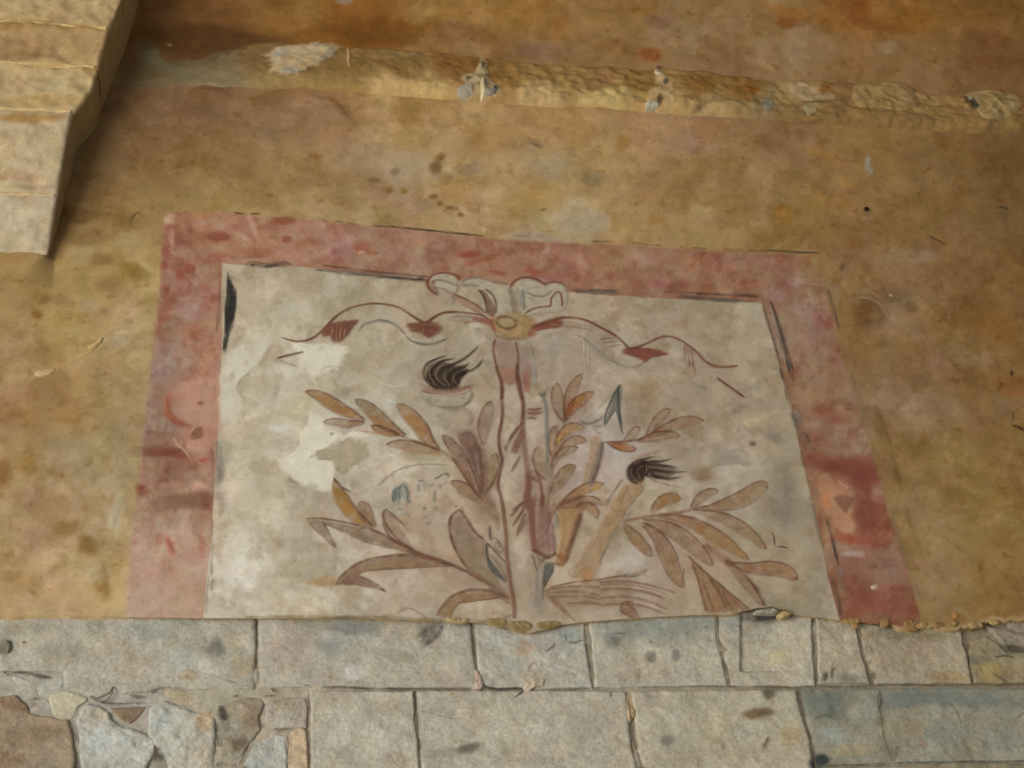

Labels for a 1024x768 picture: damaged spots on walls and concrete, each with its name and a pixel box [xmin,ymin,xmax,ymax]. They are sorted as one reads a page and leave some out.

flaking render [267,43,337,73]
spalling [457,59,499,102]
spalling [645,65,674,115]
spalling [788,82,835,114]
peeling [218,341,267,418]
peeling [280,416,367,489]